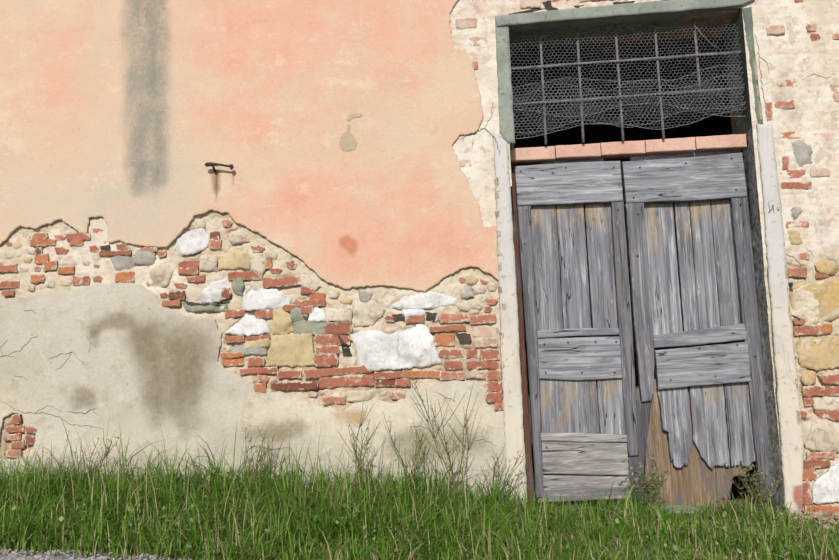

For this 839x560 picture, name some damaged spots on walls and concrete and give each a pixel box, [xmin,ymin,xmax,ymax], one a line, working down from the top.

damp [129,0,164,182]
peeling [339,113,363,151]
flaking render [450,0,659,238]
flaking render [0,210,506,413]
flaking render [721,0,839,514]
flaking render [0,413,37,460]
crack [0,400,107,461]